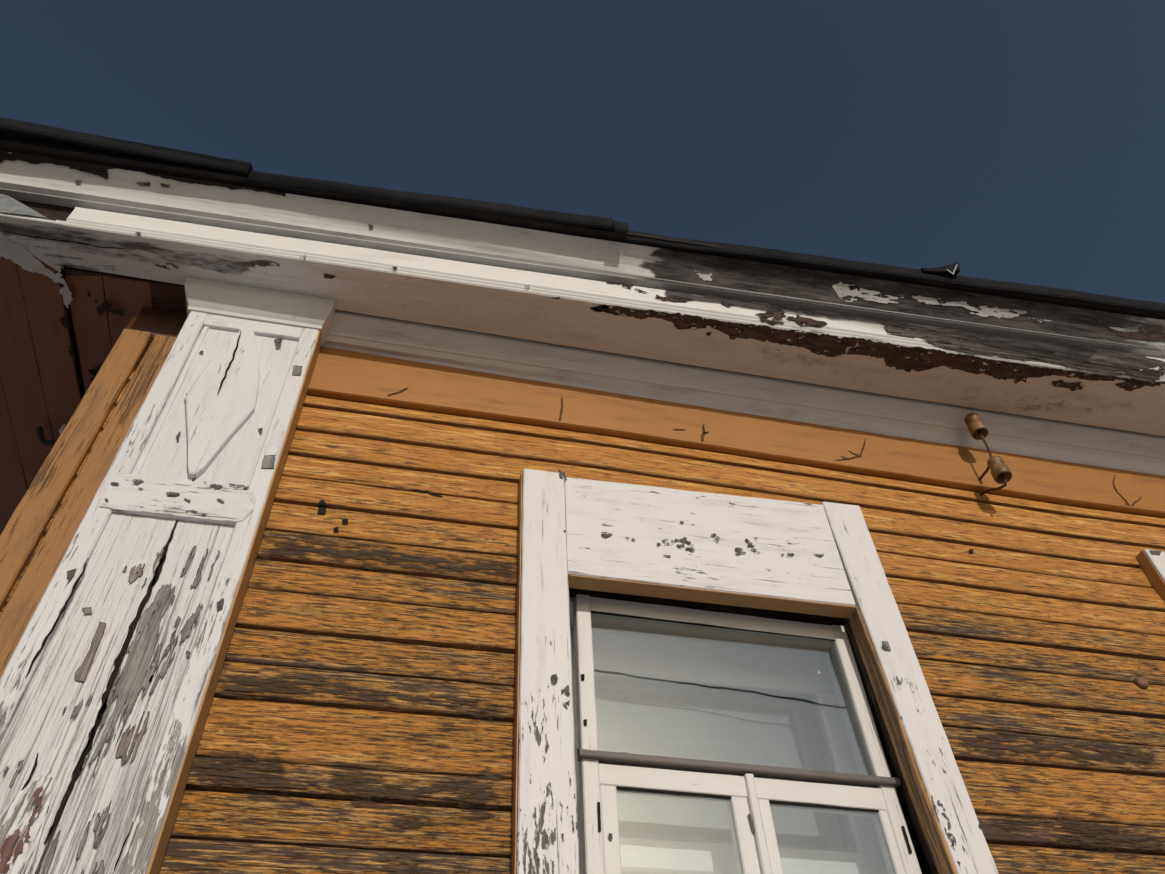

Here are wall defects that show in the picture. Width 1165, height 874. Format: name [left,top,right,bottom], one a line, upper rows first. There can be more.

peeling [0,231,73,329]
crack [218,332,241,393]
peeling [590,281,1165,392]
water stain [640,248,1165,363]
spalling [204,482,249,503]
spalling [657,537,695,557]
crack [44,524,177,844]
peeling [63,545,220,777]
spalling [551,674,570,709]
peeling [0,787,43,874]
peeling [76,802,111,874]
crack [114,822,133,870]